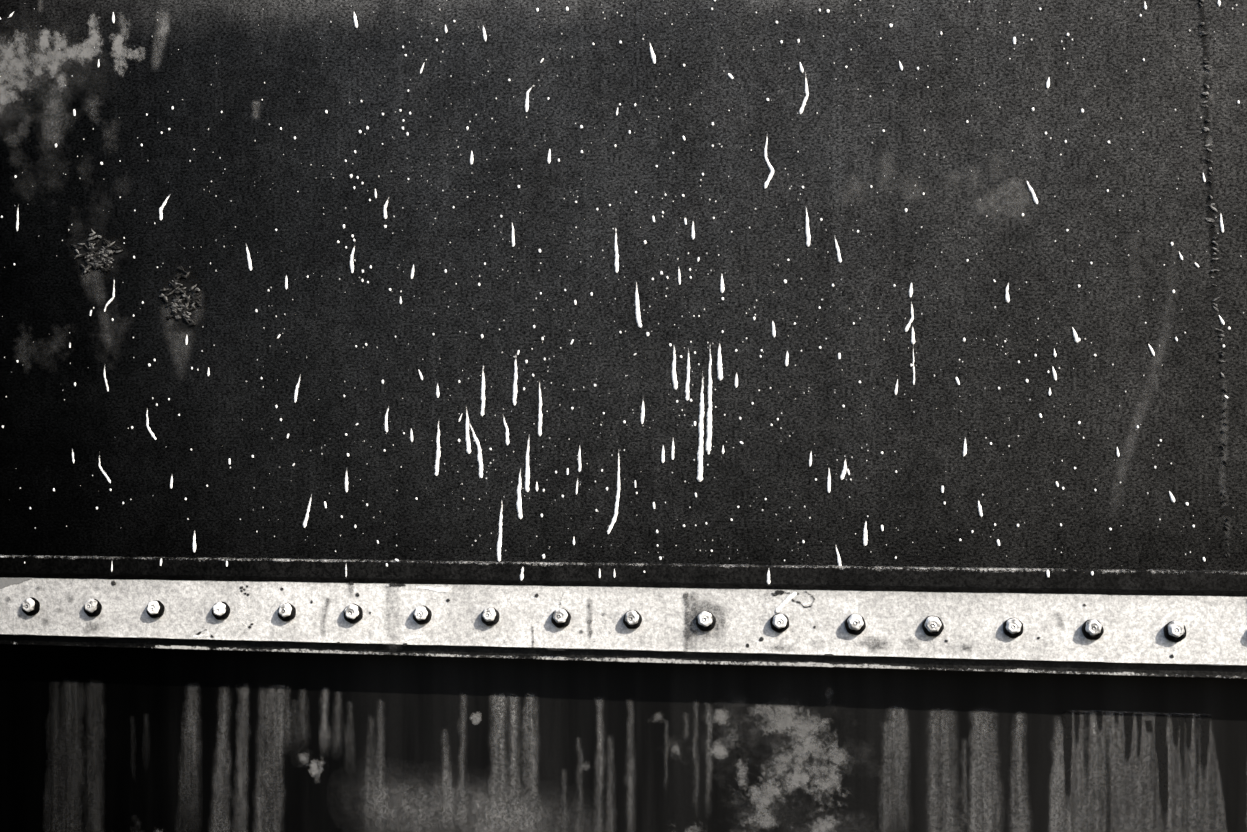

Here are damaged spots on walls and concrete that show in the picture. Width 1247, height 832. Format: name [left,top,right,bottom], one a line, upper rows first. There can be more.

water stain [492,695,536,808]
water stain [971,714,998,832]
water stain [1050,710,1211,832]